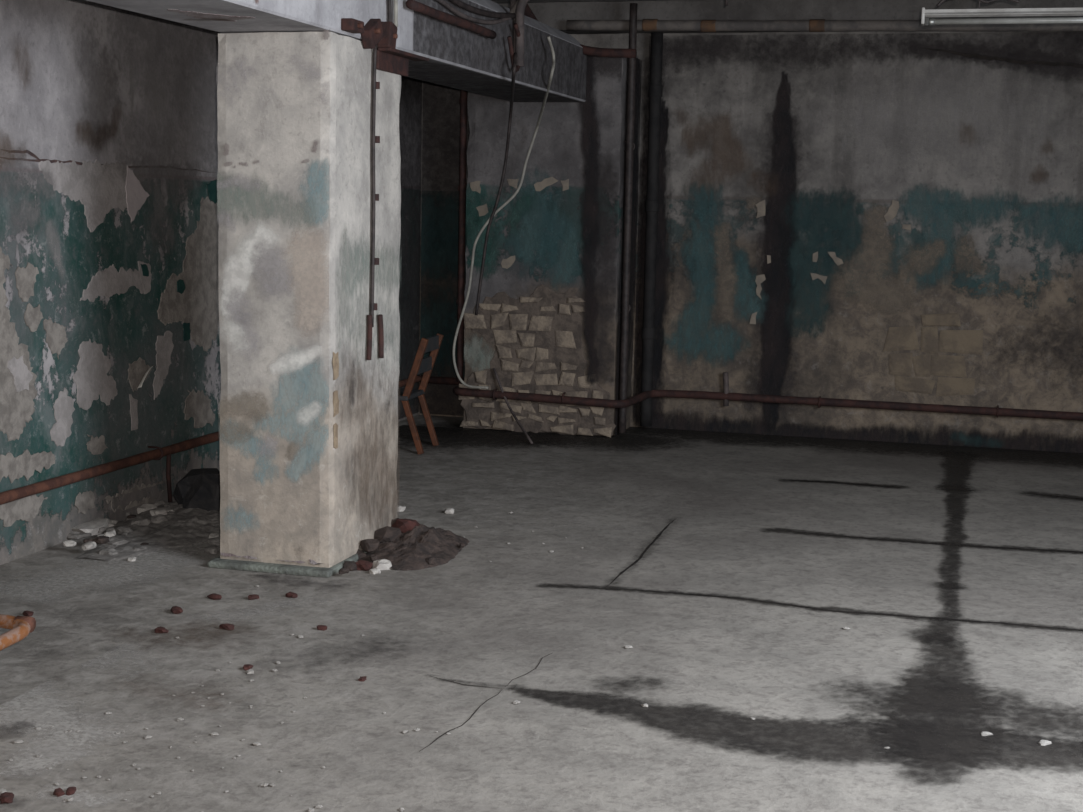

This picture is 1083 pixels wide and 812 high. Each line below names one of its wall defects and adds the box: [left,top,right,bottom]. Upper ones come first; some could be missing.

peeling [39,159,150,232]
peeling [0,180,339,483]
flaking render [459,173,616,438]
damp [398,0,1083,782]
peeling [0,494,48,527]
peeling [75,481,172,514]
crack [419,653,552,752]